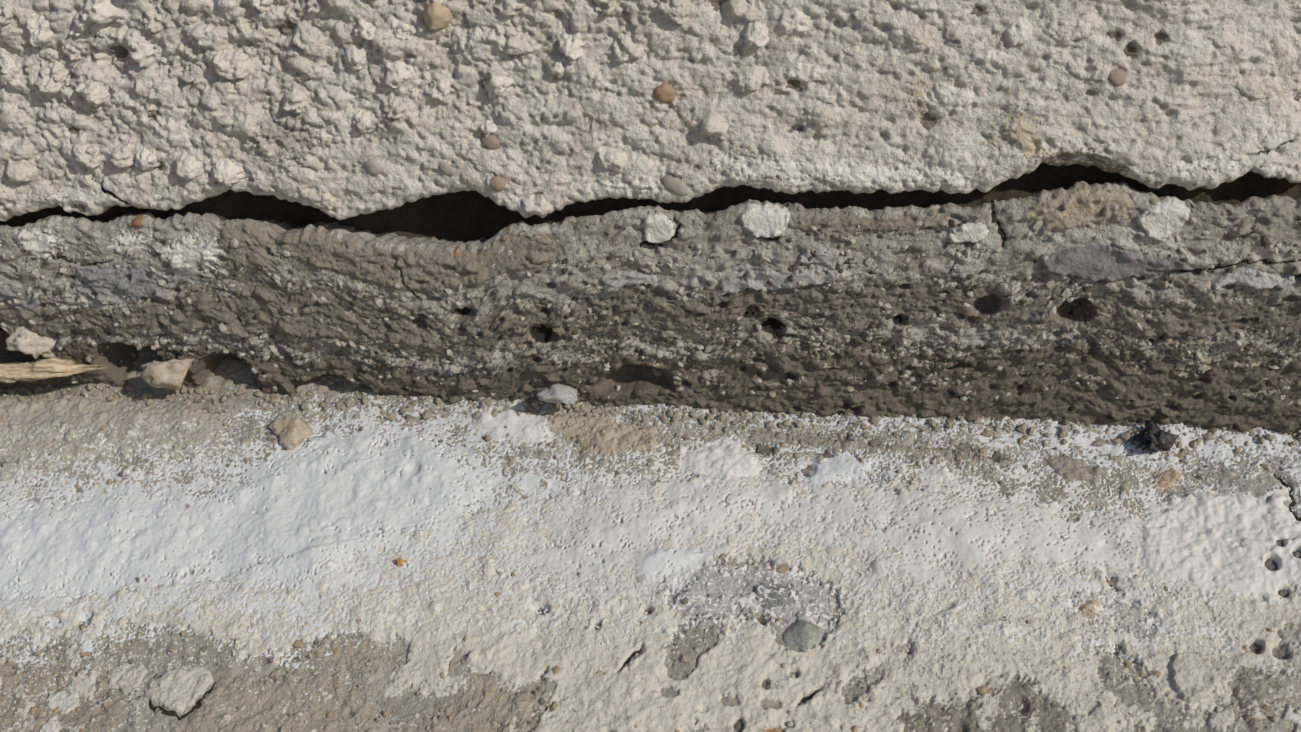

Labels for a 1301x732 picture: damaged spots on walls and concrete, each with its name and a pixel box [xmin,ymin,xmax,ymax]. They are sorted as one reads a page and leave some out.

crack [0,140,1301,248]
crack [1174,259,1301,273]
leakage [0,212,1301,720]